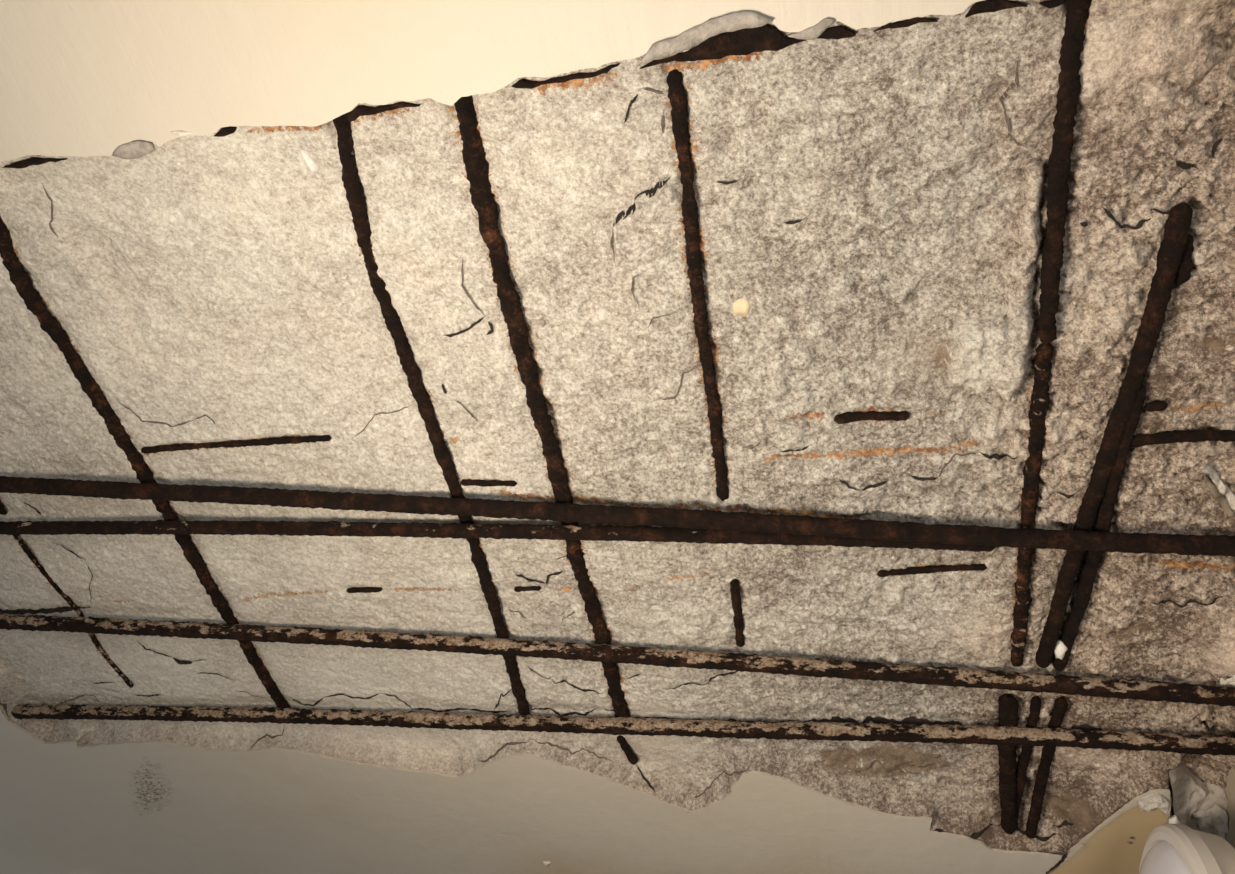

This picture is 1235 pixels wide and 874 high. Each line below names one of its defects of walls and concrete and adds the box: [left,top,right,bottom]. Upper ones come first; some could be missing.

spalling [0,0,1235,536]
rust [733,298,750,317]
rust [786,412,824,422]
rust [764,440,988,464]
rust [491,490,555,502]
rust [571,494,870,519]
rust [243,590,327,602]
spalling [0,476,1235,855]
crack [57,682,159,705]
crack [137,641,998,791]
crack [689,760,753,811]